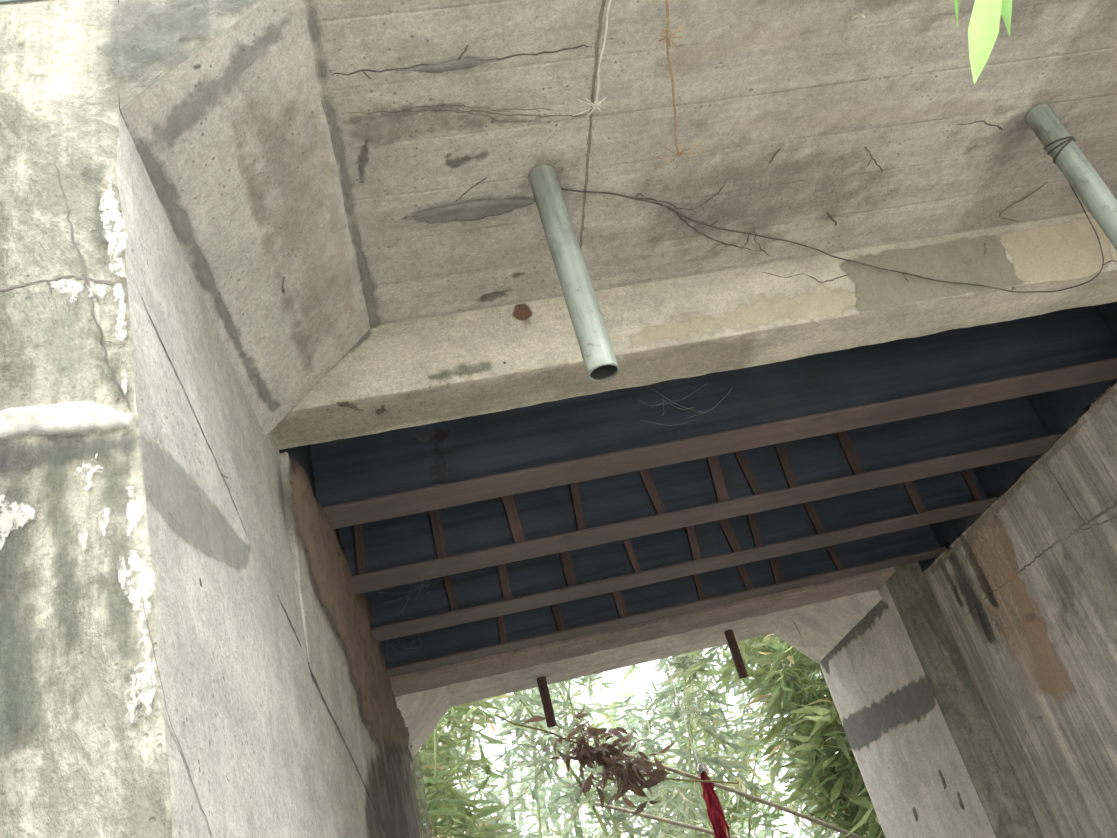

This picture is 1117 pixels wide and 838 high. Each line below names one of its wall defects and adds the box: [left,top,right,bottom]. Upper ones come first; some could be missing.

crack [0,164,131,410]
damp [95,198,109,241]
crack [332,0,606,249]
corrosion [513,304,532,320]
crack [638,179,849,283]
crack [865,146,883,172]
damp [0,602,42,751]
damp [0,440,122,646]
damp [102,532,139,656]
corrosion [969,517,1072,699]